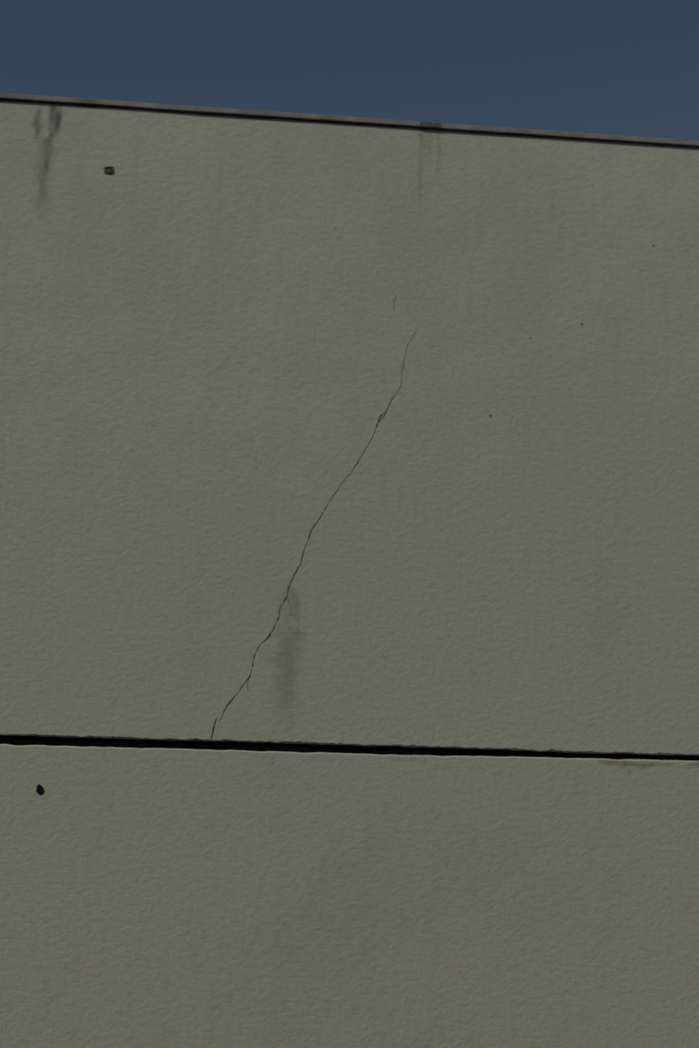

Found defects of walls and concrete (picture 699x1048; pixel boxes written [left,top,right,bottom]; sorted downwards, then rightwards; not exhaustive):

crack [211,328,417,739]